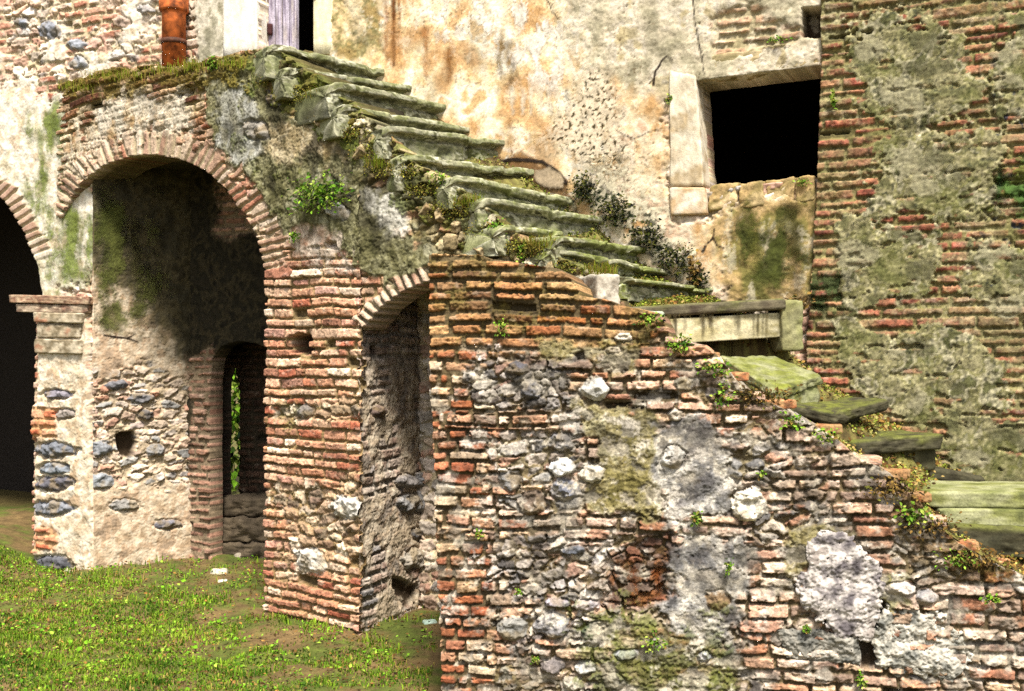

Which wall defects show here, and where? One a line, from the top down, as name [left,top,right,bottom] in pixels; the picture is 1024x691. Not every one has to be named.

water stain [469,0,564,113]
crack [650,56,671,86]
mould [736,205,814,289]
peeling [832,7,1024,482]